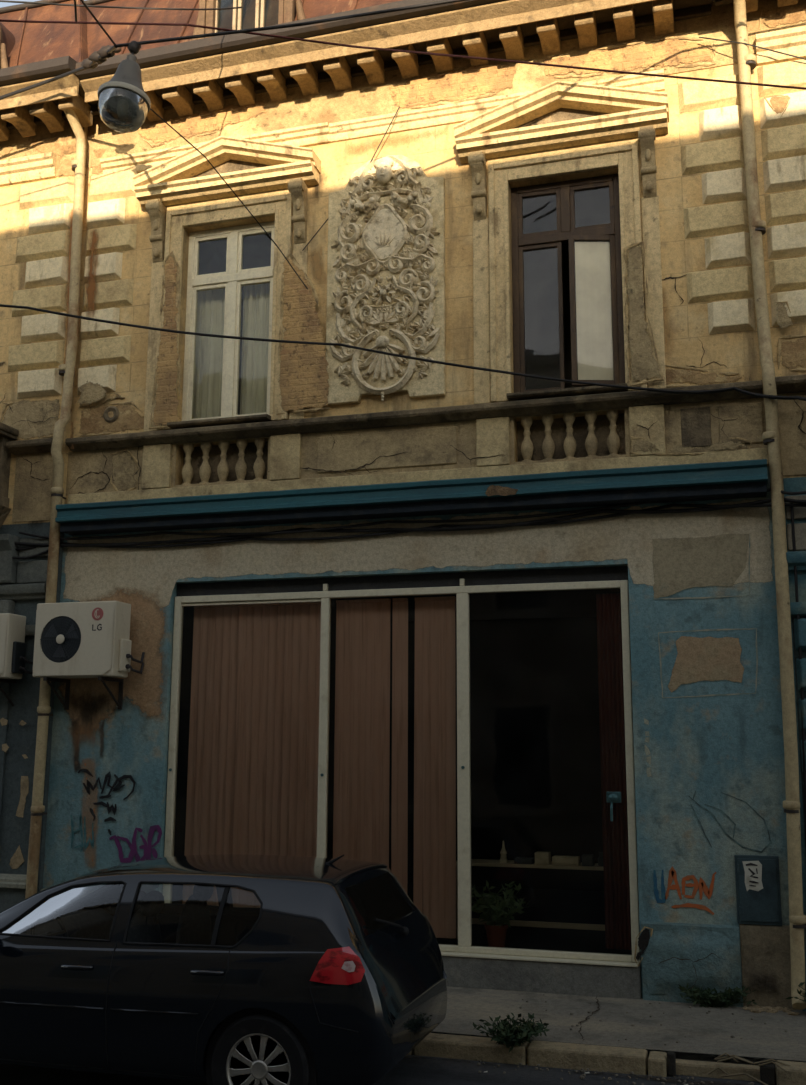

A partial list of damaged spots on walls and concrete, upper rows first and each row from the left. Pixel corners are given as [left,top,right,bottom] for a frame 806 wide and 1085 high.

spalling [77,251,181,436]
spalling [276,253,329,415]
crack [22,447,141,494]
crack [302,432,405,475]
peeling [485,485,518,497]
peeling [652,533,750,600]
peeling [658,628,758,698]
peeling [16,776,29,818]